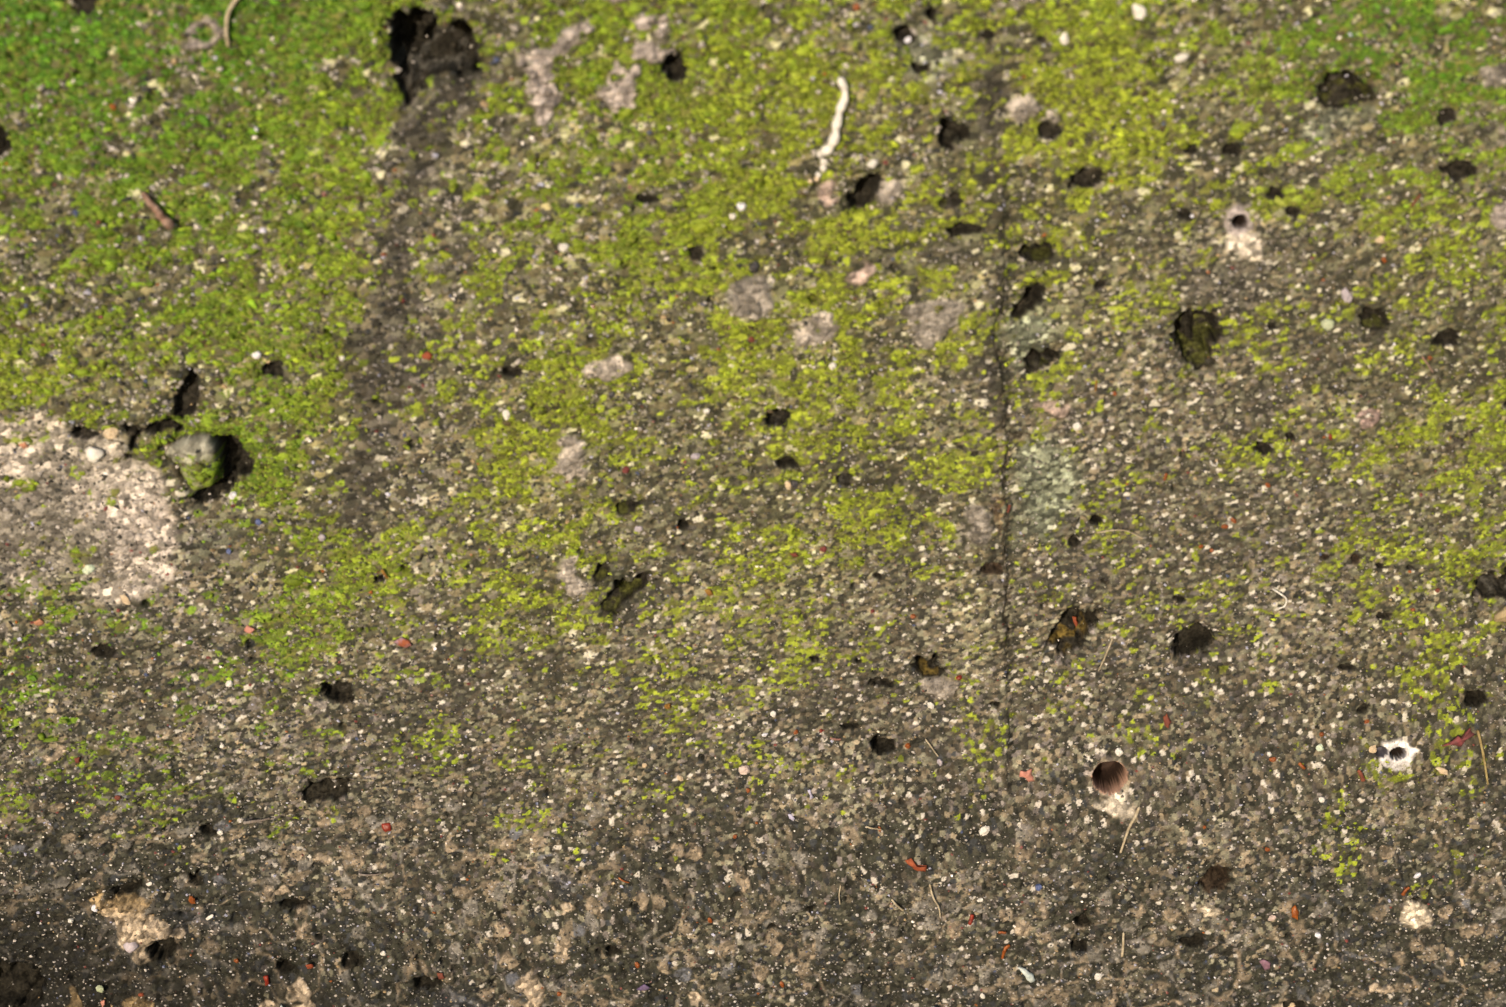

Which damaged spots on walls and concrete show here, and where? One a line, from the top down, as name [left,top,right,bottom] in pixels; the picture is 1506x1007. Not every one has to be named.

damp [319,53,495,545]
damp [923,48,1058,607]
damp [1145,238,1285,330]
damp [179,497,250,579]
damp [982,684,1029,806]